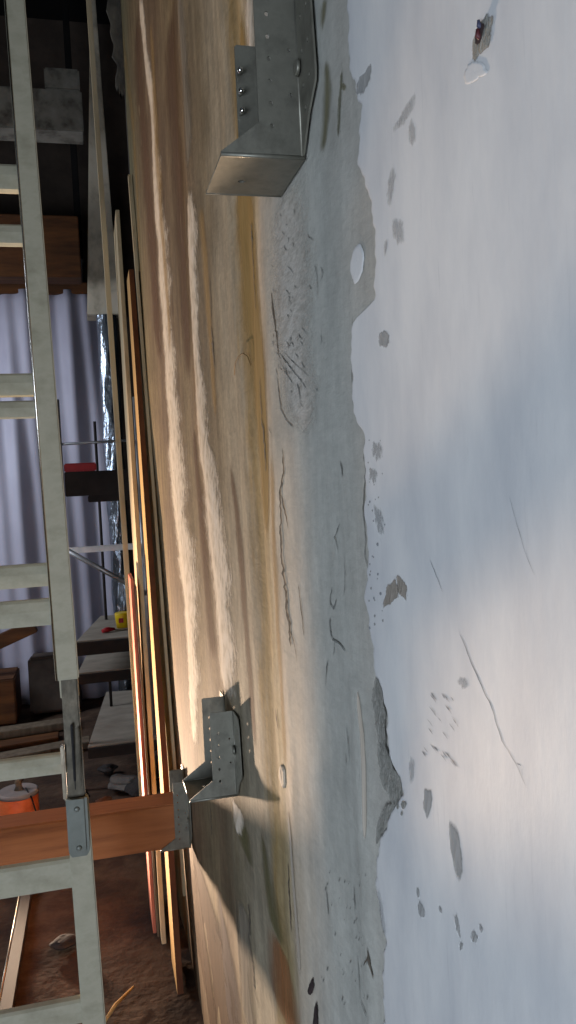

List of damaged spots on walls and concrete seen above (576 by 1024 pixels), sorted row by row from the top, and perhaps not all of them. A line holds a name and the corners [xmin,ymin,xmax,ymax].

spalling [463,14,493,85]
peeling [357,65,371,93]
peeling [350,244,364,284]
peeling [379,331,389,347]
peeling [368,543,407,636]
crack [461,638,525,784]
spalling [372,678,406,843]
peeling [449,823,462,878]
spalling [307,967,328,1024]